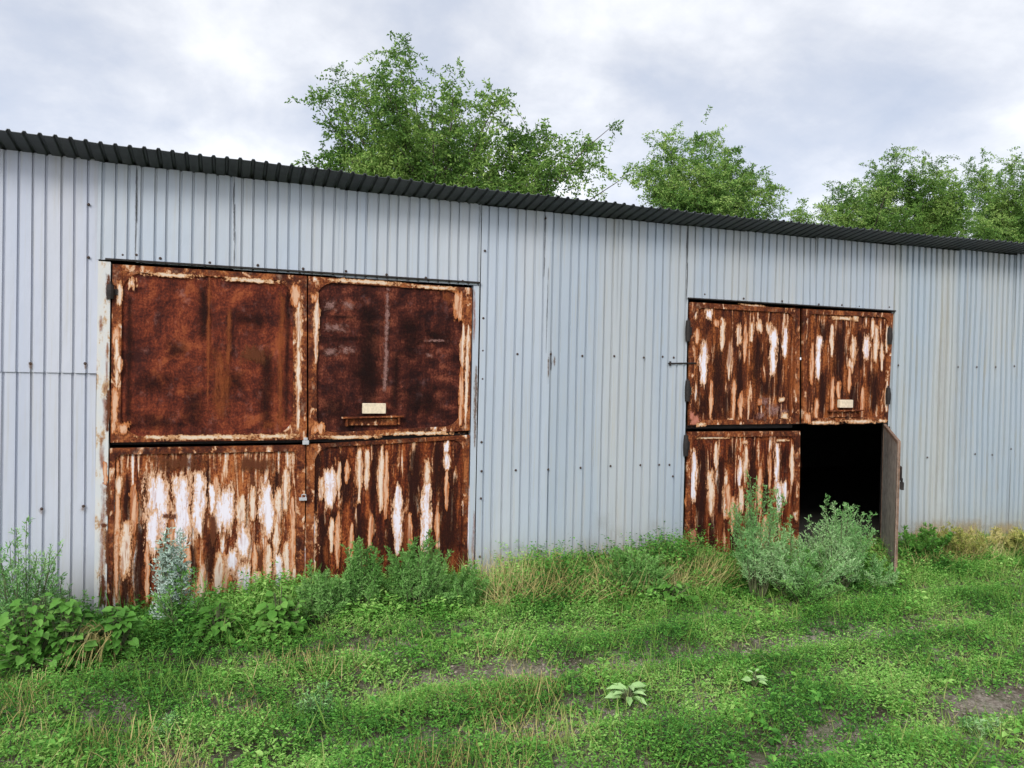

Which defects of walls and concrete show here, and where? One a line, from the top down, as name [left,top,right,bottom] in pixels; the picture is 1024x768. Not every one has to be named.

corrosion [99,455,110,607]
corrosion [120,476,163,614]
corrosion [190,516,217,582]
peeling [110,271,470,604]
corrosion [319,454,353,575]
corrosion [353,444,422,576]
corrosion [434,367,478,569]
corrosion [695,440,772,552]
peeling [684,303,794,546]
corrosion [695,320,795,419]
peeling [803,315,889,425]
corrosion [819,320,880,412]